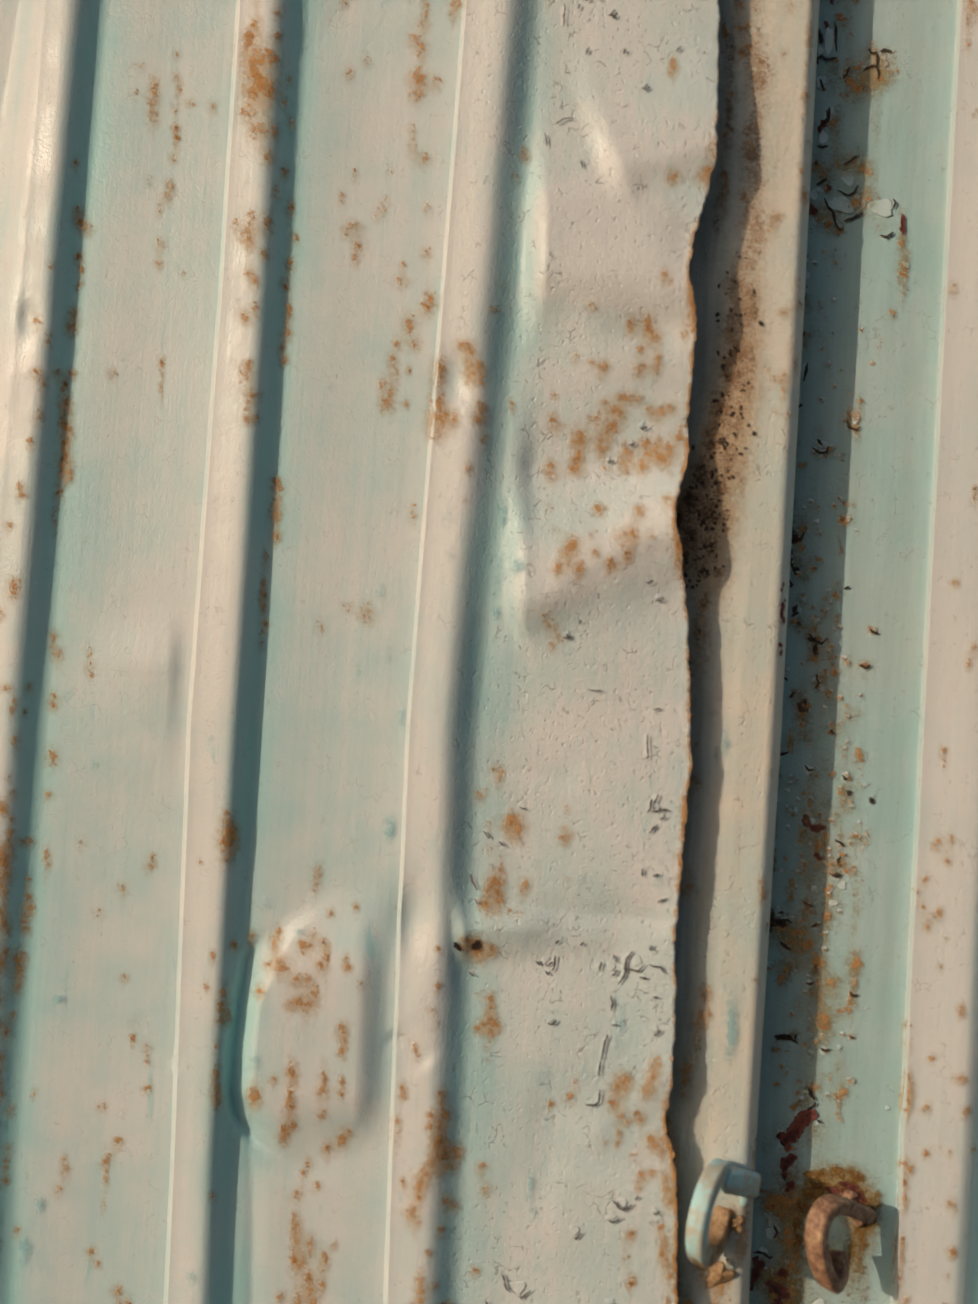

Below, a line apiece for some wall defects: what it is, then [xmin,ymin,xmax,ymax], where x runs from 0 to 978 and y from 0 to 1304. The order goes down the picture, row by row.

corrosion [241,21,288,174]
peeling [809,0,910,295]
corrosion [428,364,457,433]
corrosion [570,0,796,893]
corrosion [555,529,652,578]
corrosion [267,929,350,1012]
peeling [607,954,645,976]
corrosion [272,1061,297,1141]
corrosion [290,1214,327,1304]
corrosion [400,1091,462,1223]
corrosion [608,1056,692,1304]
corrosion [792,1164,882,1300]